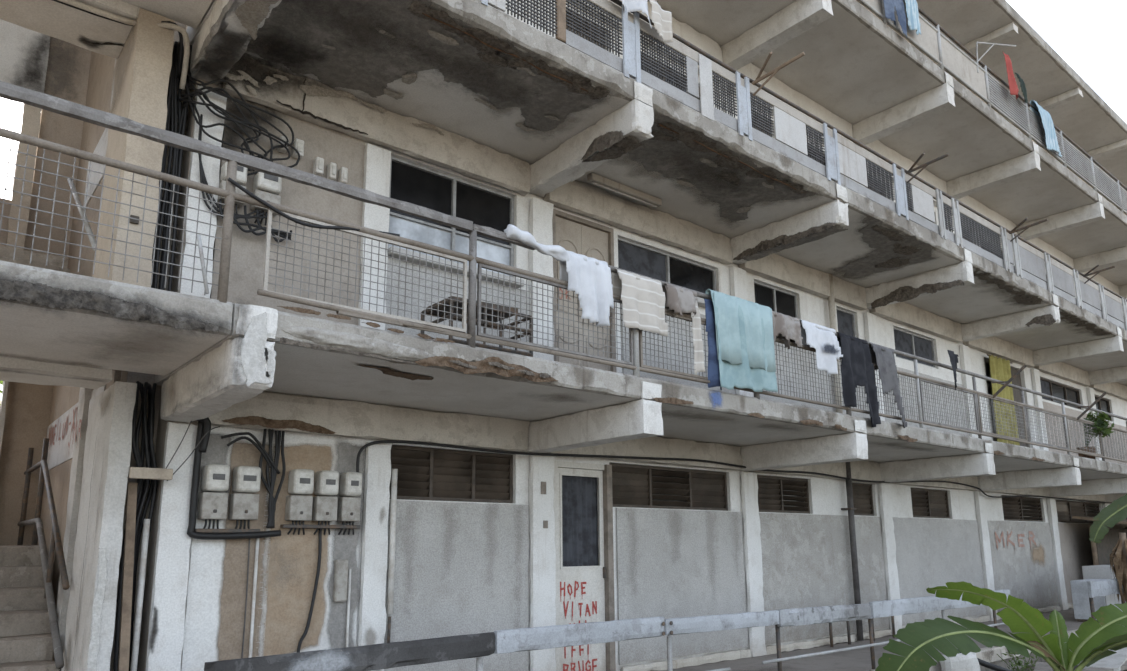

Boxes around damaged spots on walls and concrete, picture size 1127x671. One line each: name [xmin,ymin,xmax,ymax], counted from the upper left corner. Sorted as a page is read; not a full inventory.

spalling [192,0,610,131]
spalling [581,115,819,222]
spalling [733,217,934,278]
spalling [0,275,224,332]
spalling [871,267,1112,336]
peeling [234,309,276,386]
spalling [354,356,558,382]
flaking render [197,434,231,510]
flaking render [328,442,365,649]